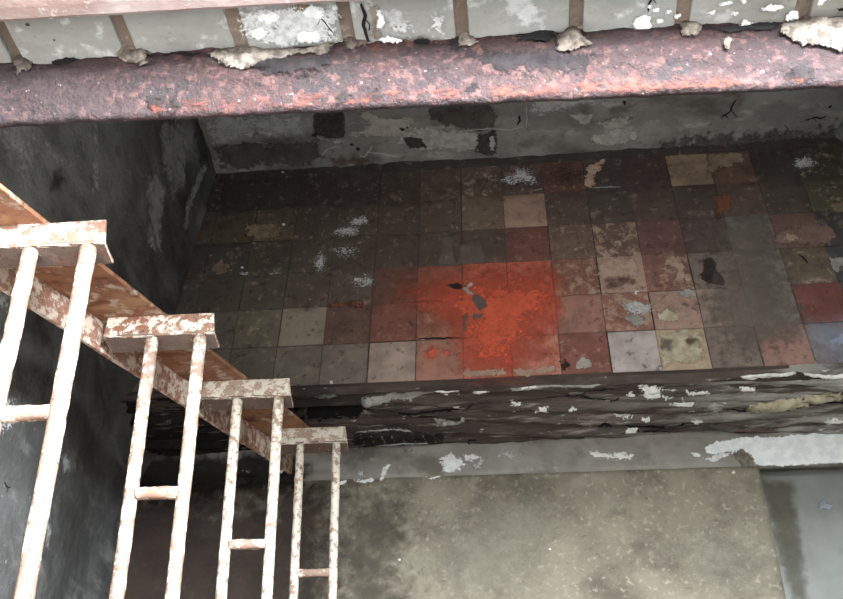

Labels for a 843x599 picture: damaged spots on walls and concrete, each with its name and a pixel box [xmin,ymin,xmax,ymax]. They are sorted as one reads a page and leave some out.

crack [360,3,370,42]
peeling [633,3,681,29]
spalling [703,0,799,33]
rust [253,54,331,78]
rust [459,46,741,92]
rust [783,64,818,81]
rust [435,82,479,98]
rust [145,94,204,113]
flaking render [312,111,498,156]
water stain [739,371,843,393]
water stain [744,391,843,414]
water stain [690,417,843,467]